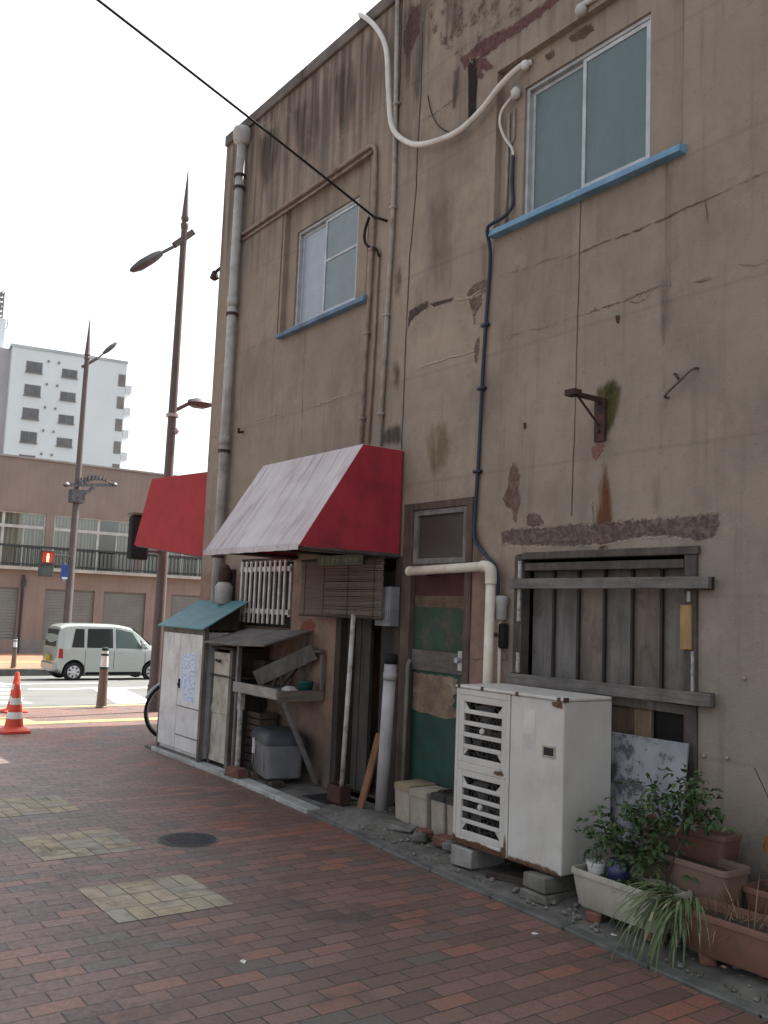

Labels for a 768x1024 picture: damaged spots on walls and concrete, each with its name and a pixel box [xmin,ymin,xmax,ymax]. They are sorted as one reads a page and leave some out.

peeling [460,0,559,79]
crack [452,173,763,301]
peeling [407,279,487,365]
crack [498,282,670,341]
rust [598,481,610,525]
flaking render [500,460,722,549]